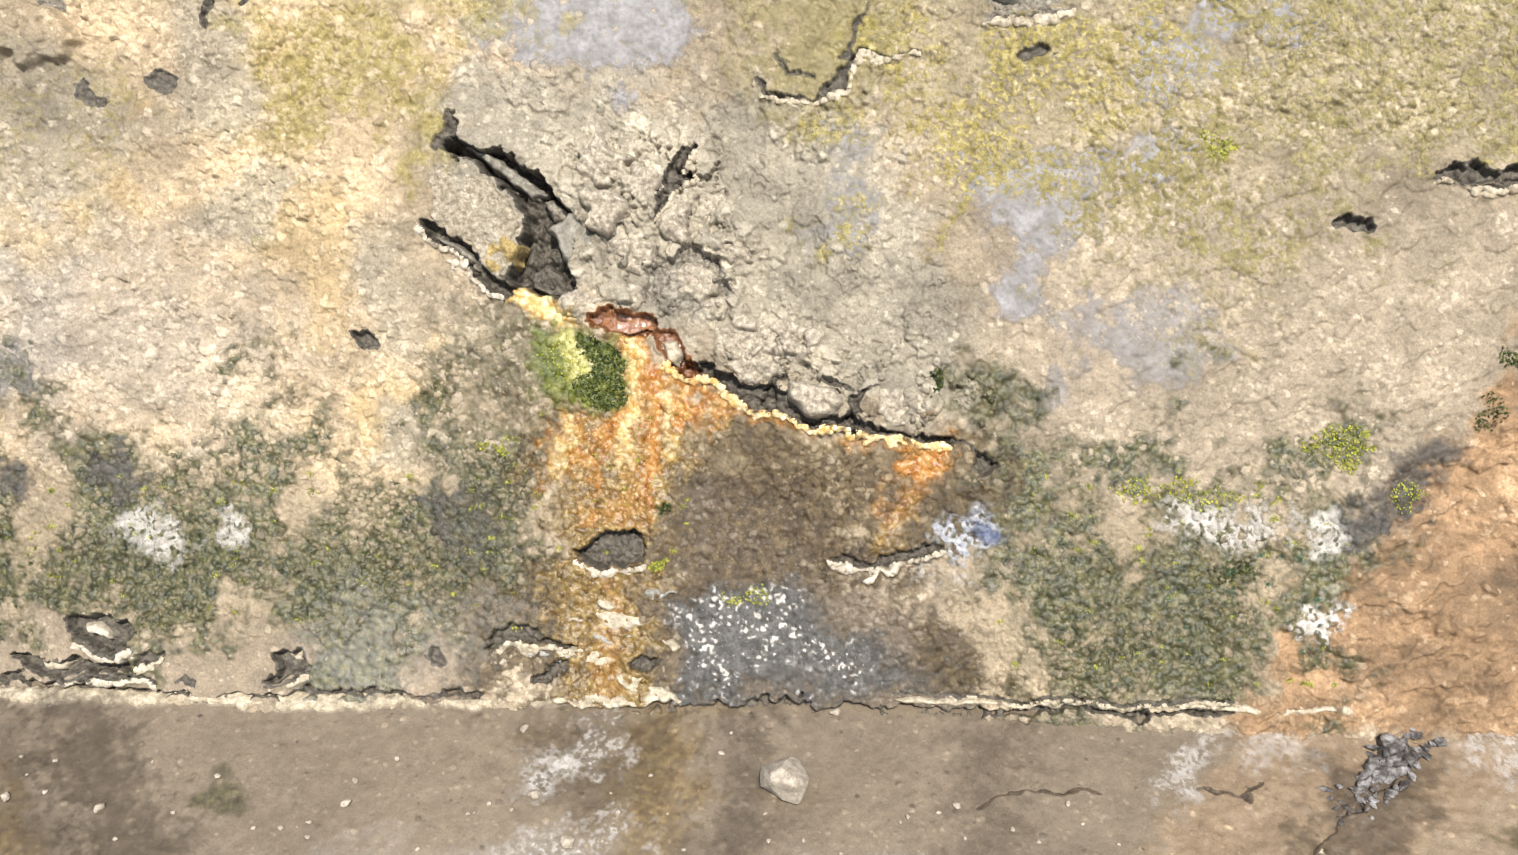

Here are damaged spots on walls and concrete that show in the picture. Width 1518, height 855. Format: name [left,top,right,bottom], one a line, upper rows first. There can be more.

crack [751,1,921,106]
spalling [1432,157,1518,199]
spalling [413,108,755,380]
corrosion [508,288,575,331]
spalling [10,612,159,692]
leakage [0,510,586,704]
corrosion [539,333,733,708]
crack [0,588,1355,726]
leakage [613,401,1021,715]
corrosion [874,448,949,551]
leakage [1297,605,1353,640]
crack [1196,782,1264,805]